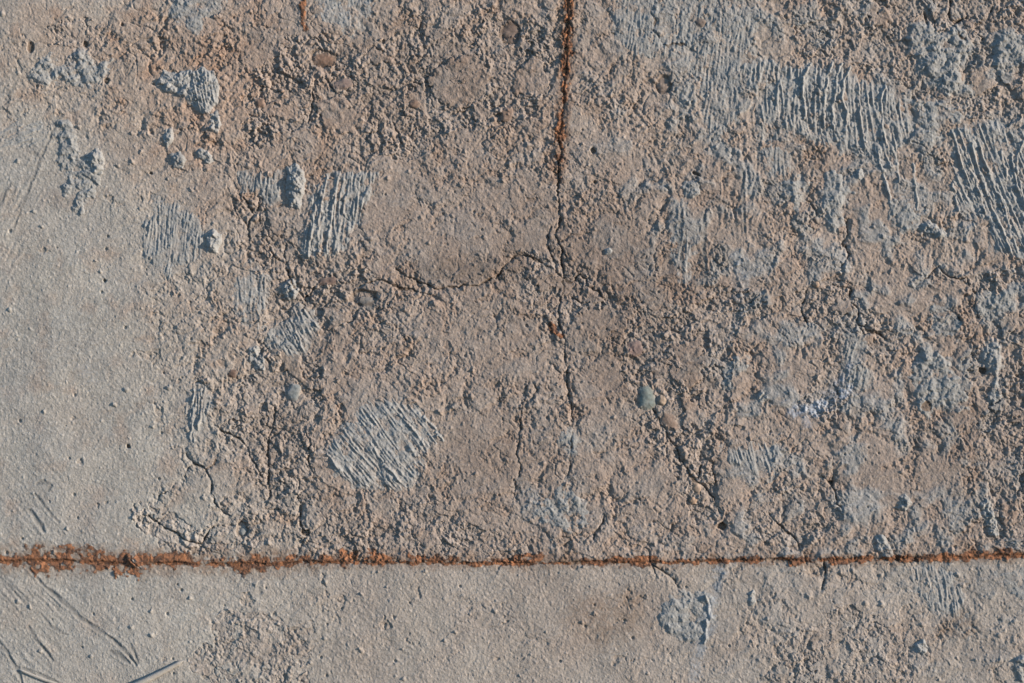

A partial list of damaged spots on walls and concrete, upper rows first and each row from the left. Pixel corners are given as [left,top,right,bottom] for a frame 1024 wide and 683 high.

rust [555,0,575,178]
crack [360,149,602,486]
crack [649,404,719,511]
rust [0,544,1024,581]